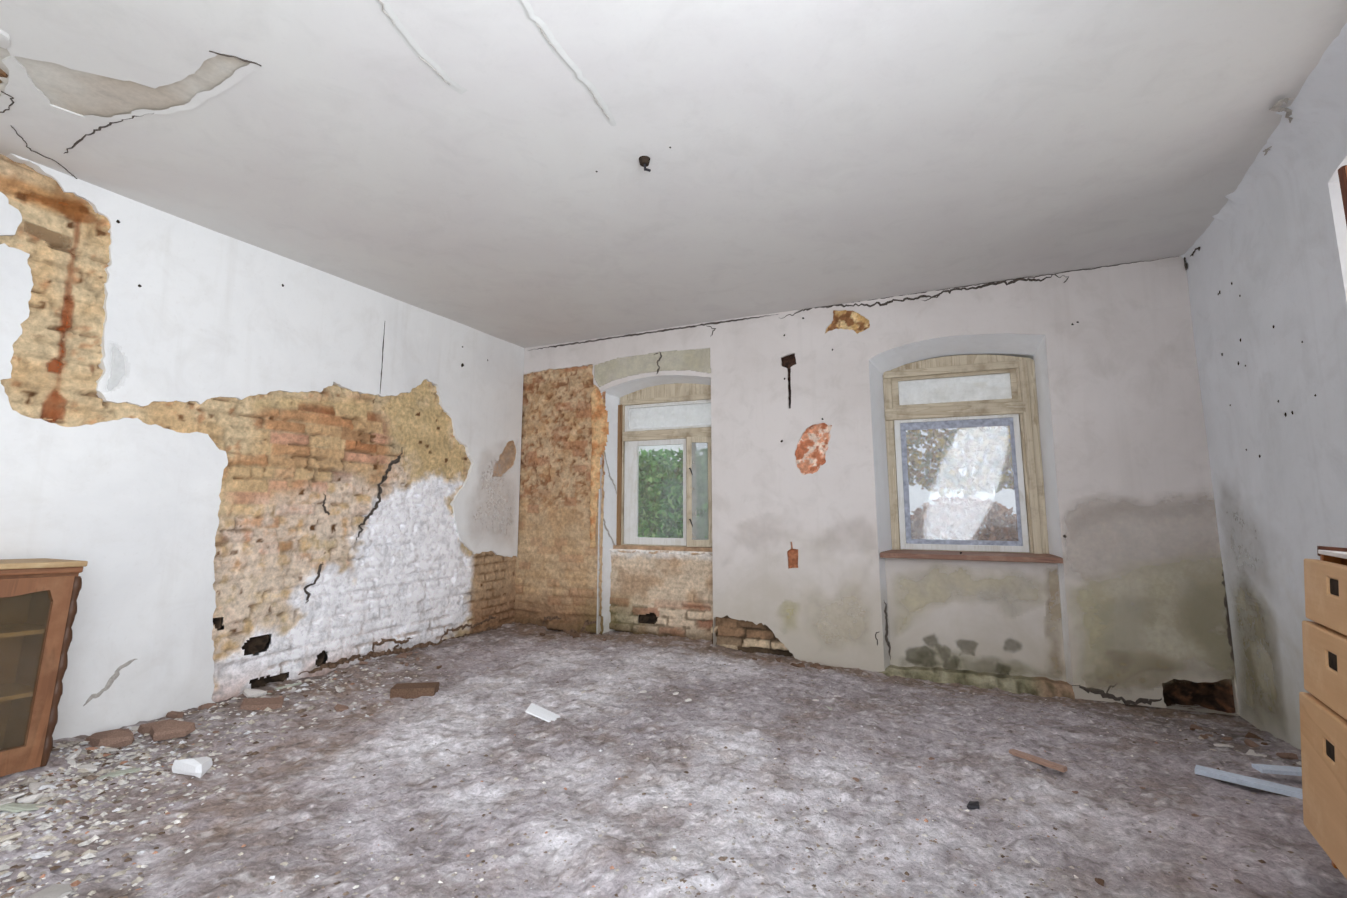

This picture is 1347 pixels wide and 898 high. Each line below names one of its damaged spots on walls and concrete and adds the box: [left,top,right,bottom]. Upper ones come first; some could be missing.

flaking render [0,29,261,154]
crack [375,0,467,95]
crack [516,0,616,126]
spalling [825,310,870,334]
crack [528,247,1200,374]
flaking render [0,154,713,706]
spalling [795,423,832,475]
water stain [1049,570,1061,632]
water stain [1067,502,1279,714]
crack [1071,683,1162,705]
spalling [1162,679,1236,715]